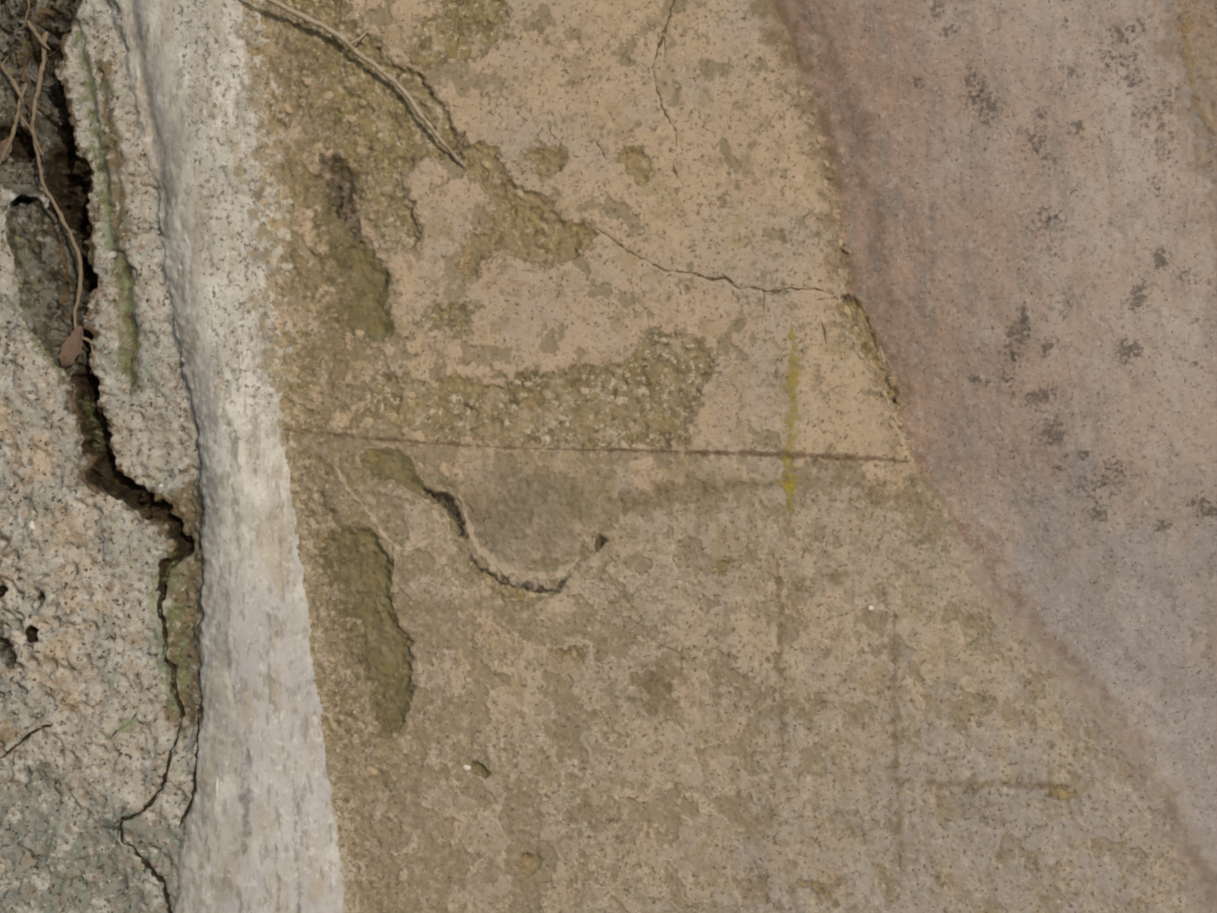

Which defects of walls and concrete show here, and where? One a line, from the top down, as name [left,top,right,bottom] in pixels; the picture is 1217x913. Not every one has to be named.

damp [80,60,142,394]
spalling [283,0,599,347]
spalling [617,146,655,186]
crack [652,0,683,186]
crack [586,223,831,342]
crack [0,0,199,913]
spalling [289,326,718,542]
crack [706,449,765,457]
spalling [468,558,562,602]